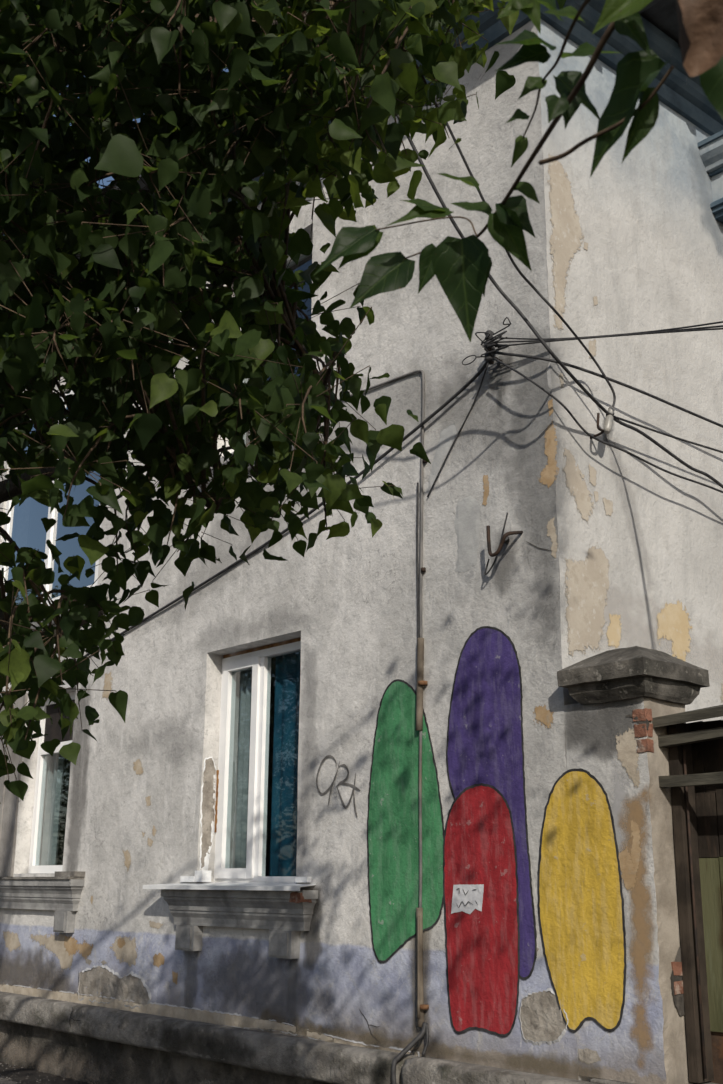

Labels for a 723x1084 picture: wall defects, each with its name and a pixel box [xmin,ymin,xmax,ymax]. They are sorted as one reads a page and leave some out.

peeling [547,154,588,330]
peeling [539,399,613,521]
peeling [546,518,622,656]
peeling [656,600,692,661]
flaking render [199,757,216,871]
peeling [0,931,420,1057]
flaking render [518,988,568,1046]